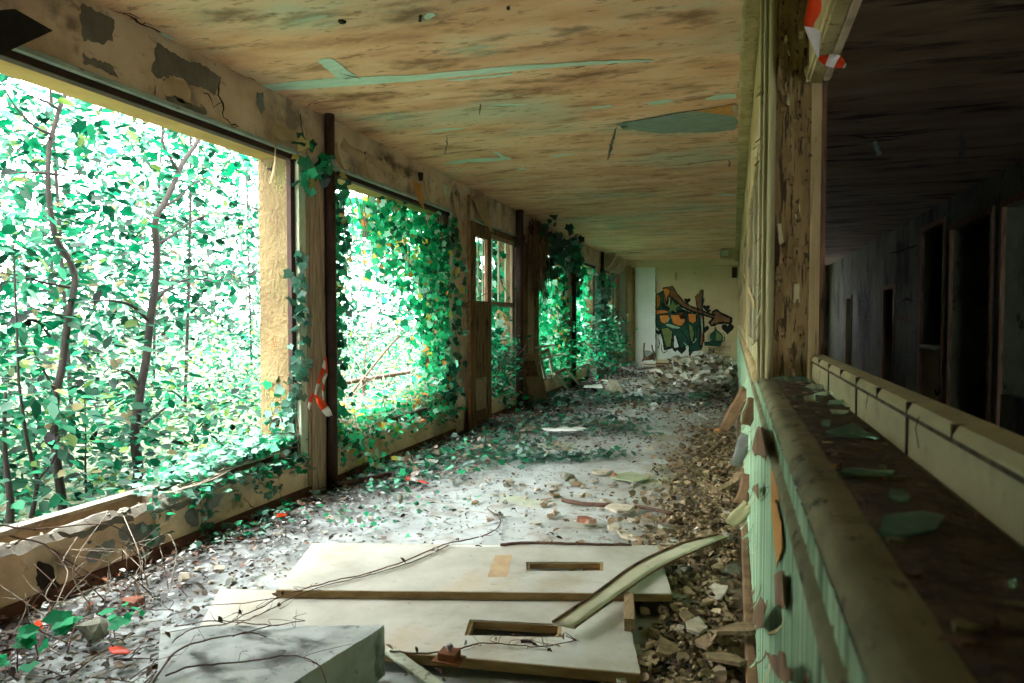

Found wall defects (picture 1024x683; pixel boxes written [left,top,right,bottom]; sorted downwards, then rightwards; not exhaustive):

peeling [79,3,119,79]
peeling [151,42,221,115]
crack [203,82,239,127]
flaking render [256,58,653,114]
peeling [777,0,812,186]
peeling [774,204,809,308]
peeling [57,493,224,563]
peeling [625,378,809,683]
spalling [36,561,60,591]